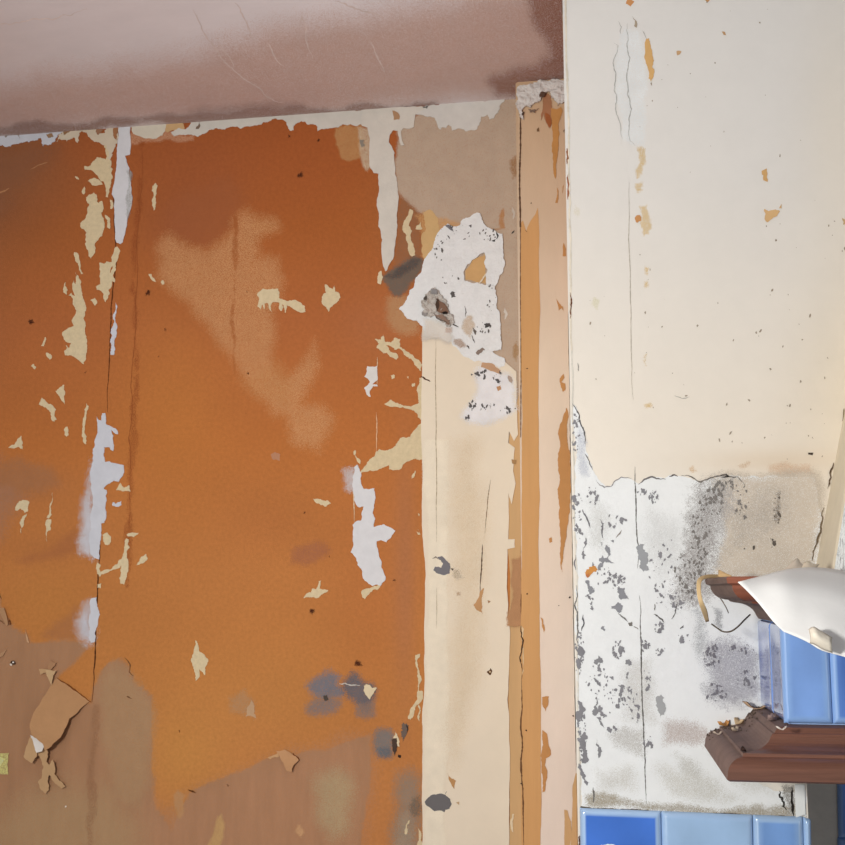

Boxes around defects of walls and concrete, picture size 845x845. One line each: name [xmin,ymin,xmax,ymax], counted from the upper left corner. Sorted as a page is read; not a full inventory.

leakage [0,0,564,223]
crack [613,23,647,144]
crack [107,142,144,588]
flaking render [0,79,564,845]
leakage [385,293,422,338]
leakage [391,195,425,267]
flaking render [557,0,828,845]
leakage [616,654,660,729]
leakage [580,761,807,817]
leakage [640,461,815,713]